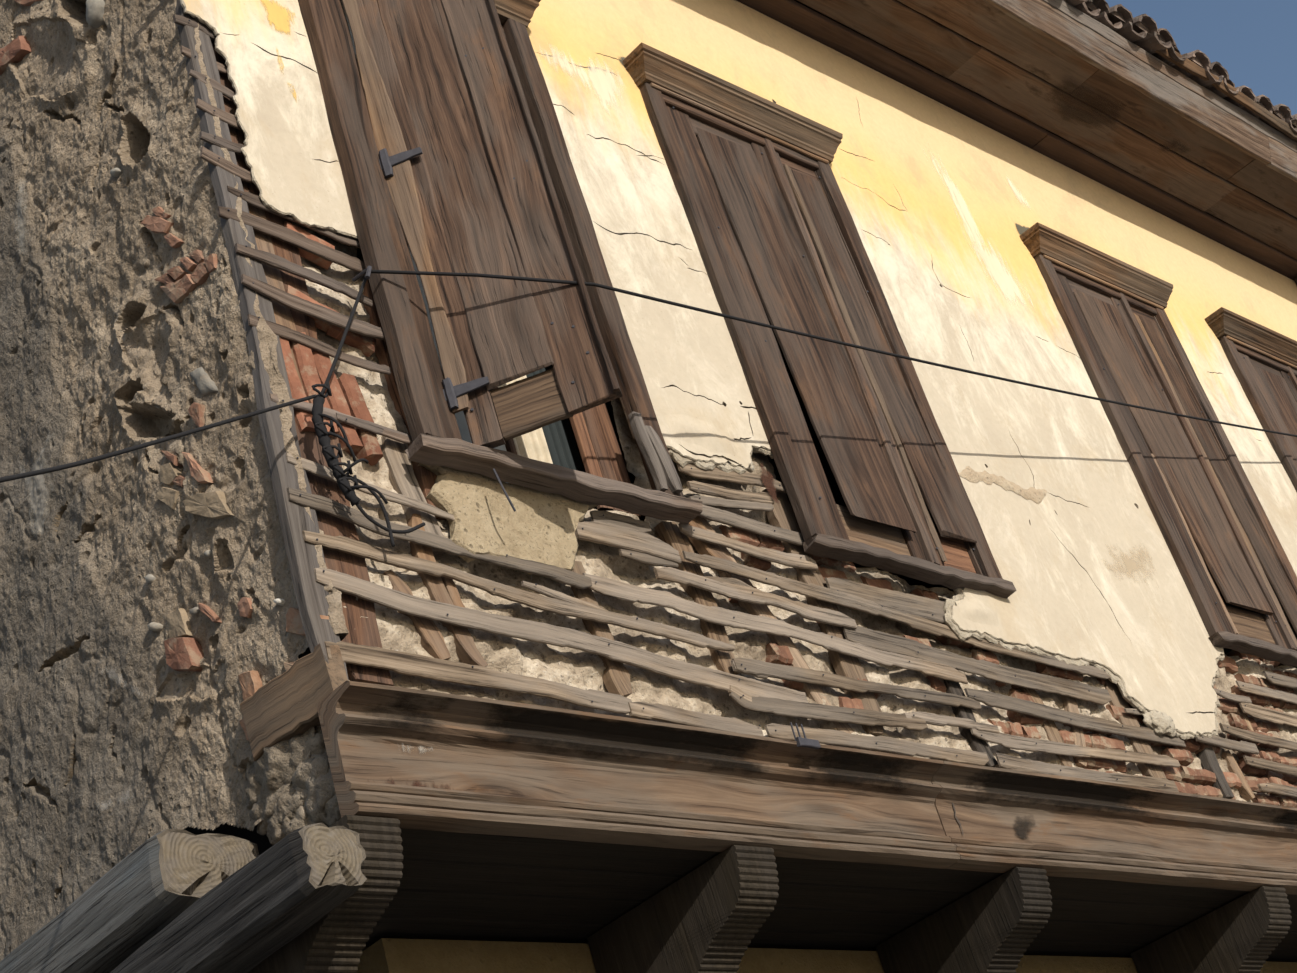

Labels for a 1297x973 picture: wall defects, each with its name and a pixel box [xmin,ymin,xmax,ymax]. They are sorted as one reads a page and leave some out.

crack [220,32,317,73]
crack [553,104,665,163]
crack [593,221,706,274]
crack [664,385,756,465]
crack [958,432,1130,640]